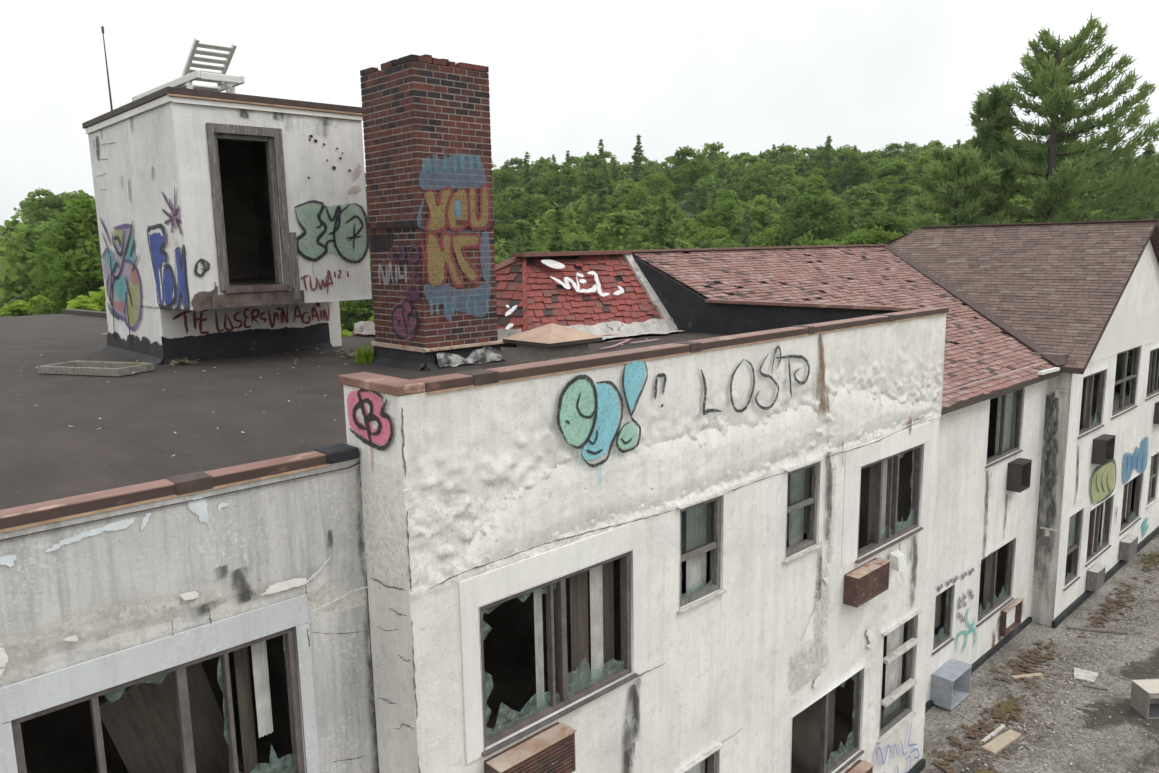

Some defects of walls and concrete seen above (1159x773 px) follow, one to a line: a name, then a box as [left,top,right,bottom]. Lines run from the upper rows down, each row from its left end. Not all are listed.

peeling [0,554,17,568]
peeling [45,513,152,553]
peeling [188,497,230,531]
damp [221,566,252,601]
spalling [261,578,309,595]
crack [399,408,407,478]
damp [826,452,843,534]
crack [826,416,931,458]
damp [1036,393,1058,552]
spalling [0,591,225,676]
crack [305,510,673,773]
damp [624,680,640,773]